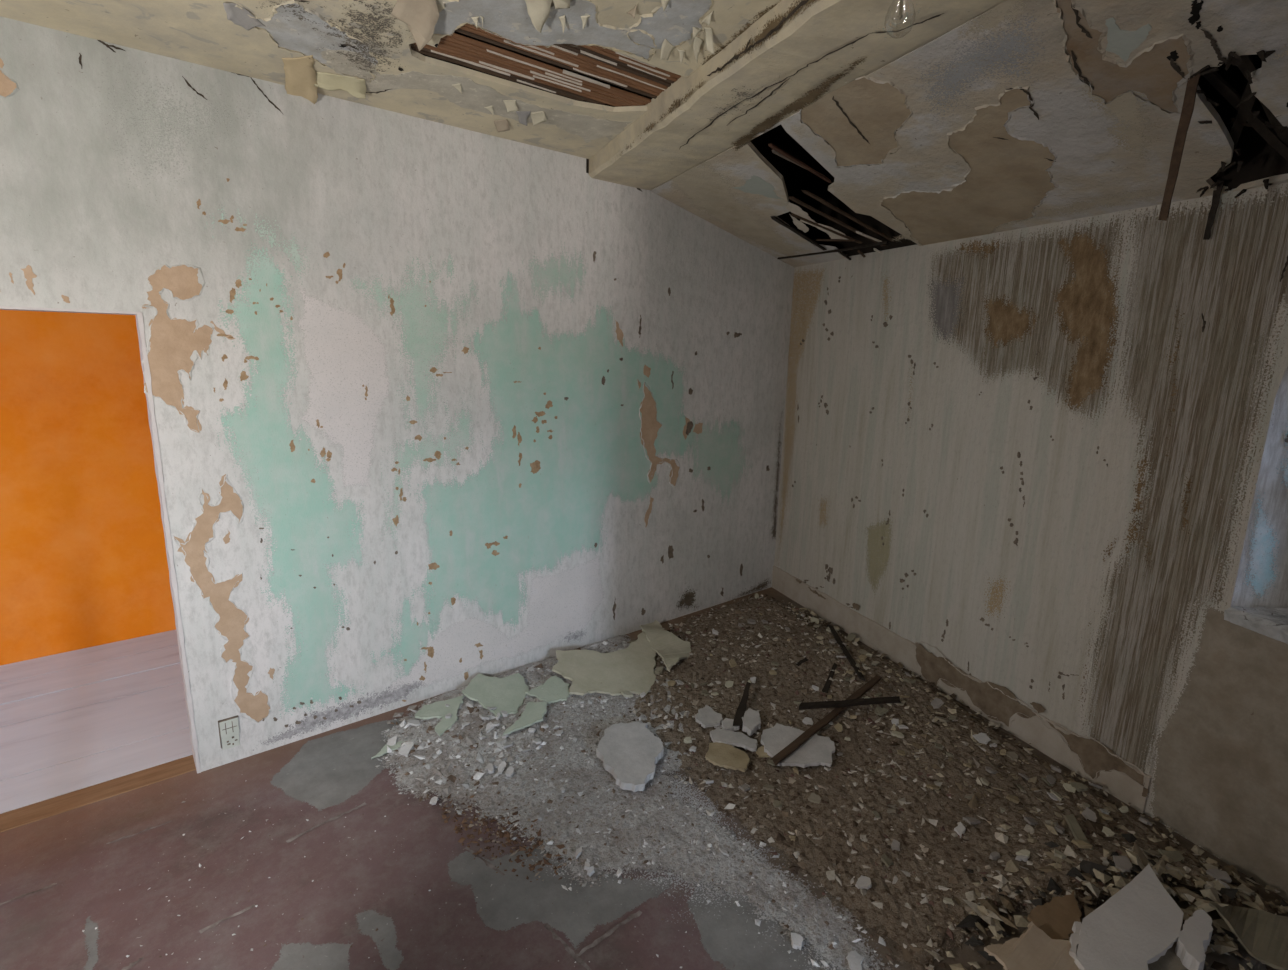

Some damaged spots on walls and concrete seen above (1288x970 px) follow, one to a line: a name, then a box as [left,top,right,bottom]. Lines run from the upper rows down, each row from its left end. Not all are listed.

peeling [223,0,632,143]
peeling [391,0,715,64]
leakage [619,82,703,156]
leakage [700,0,815,73]
leakage [709,58,865,151]
peeling [141,263,293,433]
peeling [289,440,332,461]
peeling [391,461,407,527]
peeling [423,437,469,465]
peeling [637,365,711,528]
peeling [880,86,1288,900]
peeling [173,473,434,812]